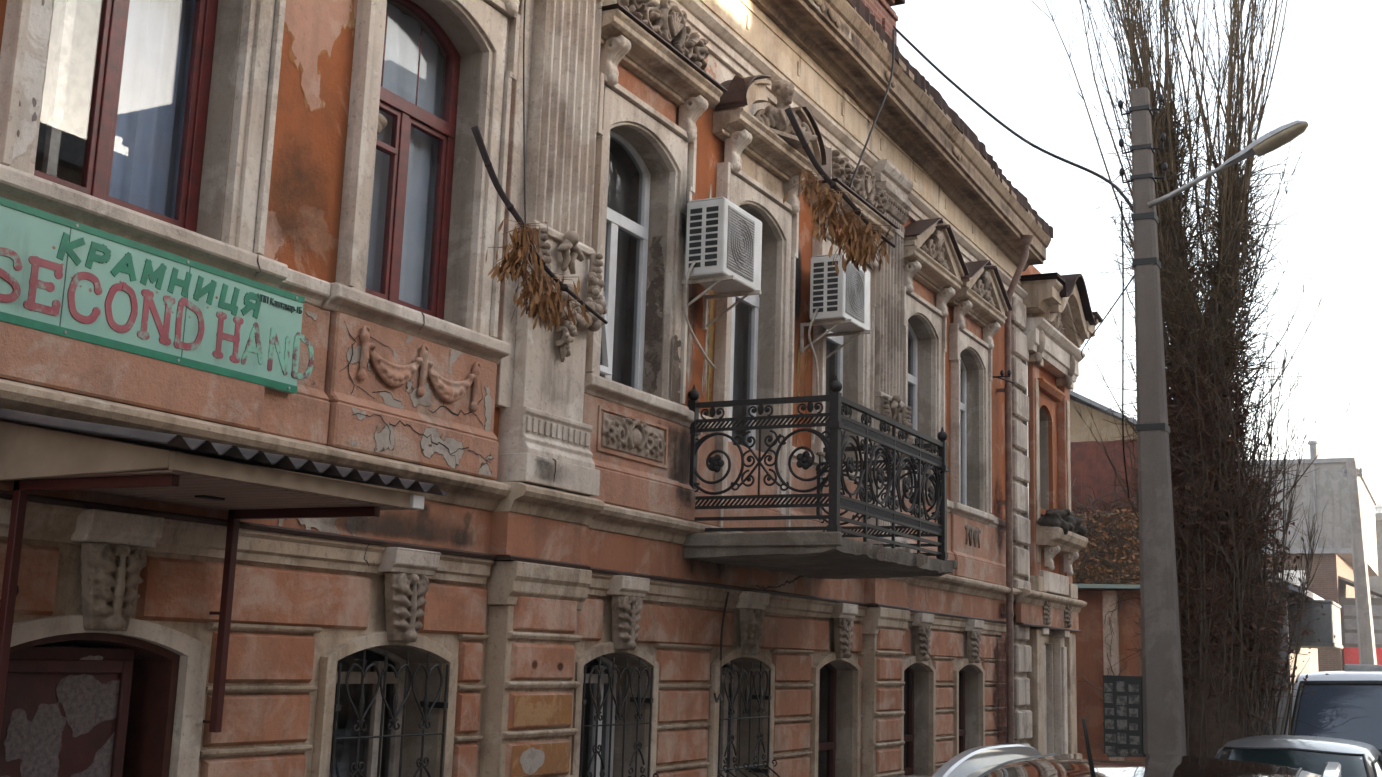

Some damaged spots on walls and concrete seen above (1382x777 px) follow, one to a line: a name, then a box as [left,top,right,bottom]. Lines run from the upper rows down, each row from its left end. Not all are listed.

peeling [284,0,358,112]
spalling [352,381,440,452]
crack [339,321,490,463]
spalling [484,386,492,431]
spalling [420,427,464,469]
leakage [332,457,469,493]
leakage [340,506,469,544]